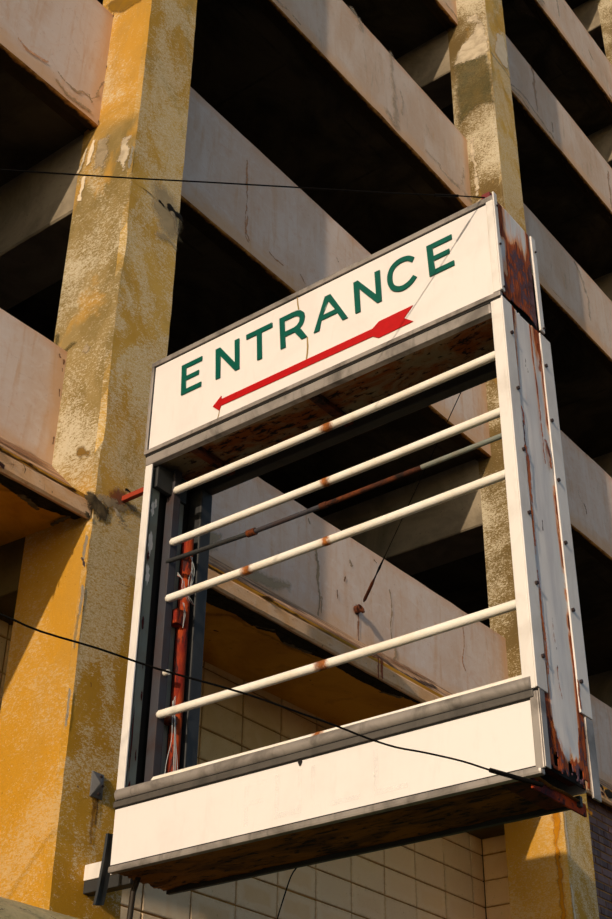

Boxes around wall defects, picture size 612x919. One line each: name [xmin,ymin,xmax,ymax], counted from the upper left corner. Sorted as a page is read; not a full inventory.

leakage [456,55,493,121]
peeling [77,135,110,201]
peeling [117,135,134,171]
leakage [154,185,177,250]
corrosion [525,330,552,469]
leakage [0,438,77,492]
peeling [0,473,137,527]
corrosion [521,406,543,546]
crack [314,550,322,616]
corrosion [537,570,558,674]
corrosion [547,716,557,751]